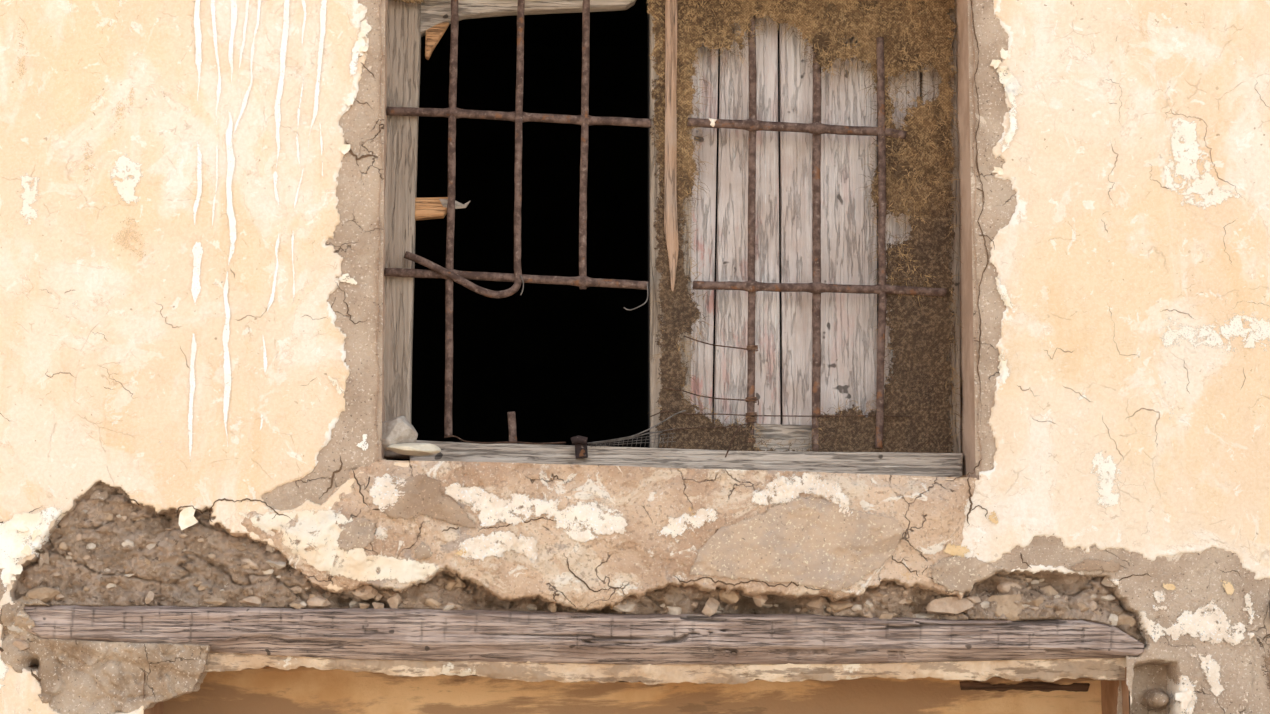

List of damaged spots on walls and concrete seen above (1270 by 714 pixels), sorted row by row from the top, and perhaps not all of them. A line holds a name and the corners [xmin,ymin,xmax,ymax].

water stain [191,242,203,305]
water stain [193,0,261,447]
water stain [267,231,295,312]
water stain [273,0,327,211]
spalling [262,0,386,510]
spalling [968,0,1024,476]
peeling [1164,117,1242,210]
water stain [188,334,197,461]
spalling [0,506,210,714]
crack [675,576,820,590]
crack [892,556,943,586]
spalling [974,534,1270,714]